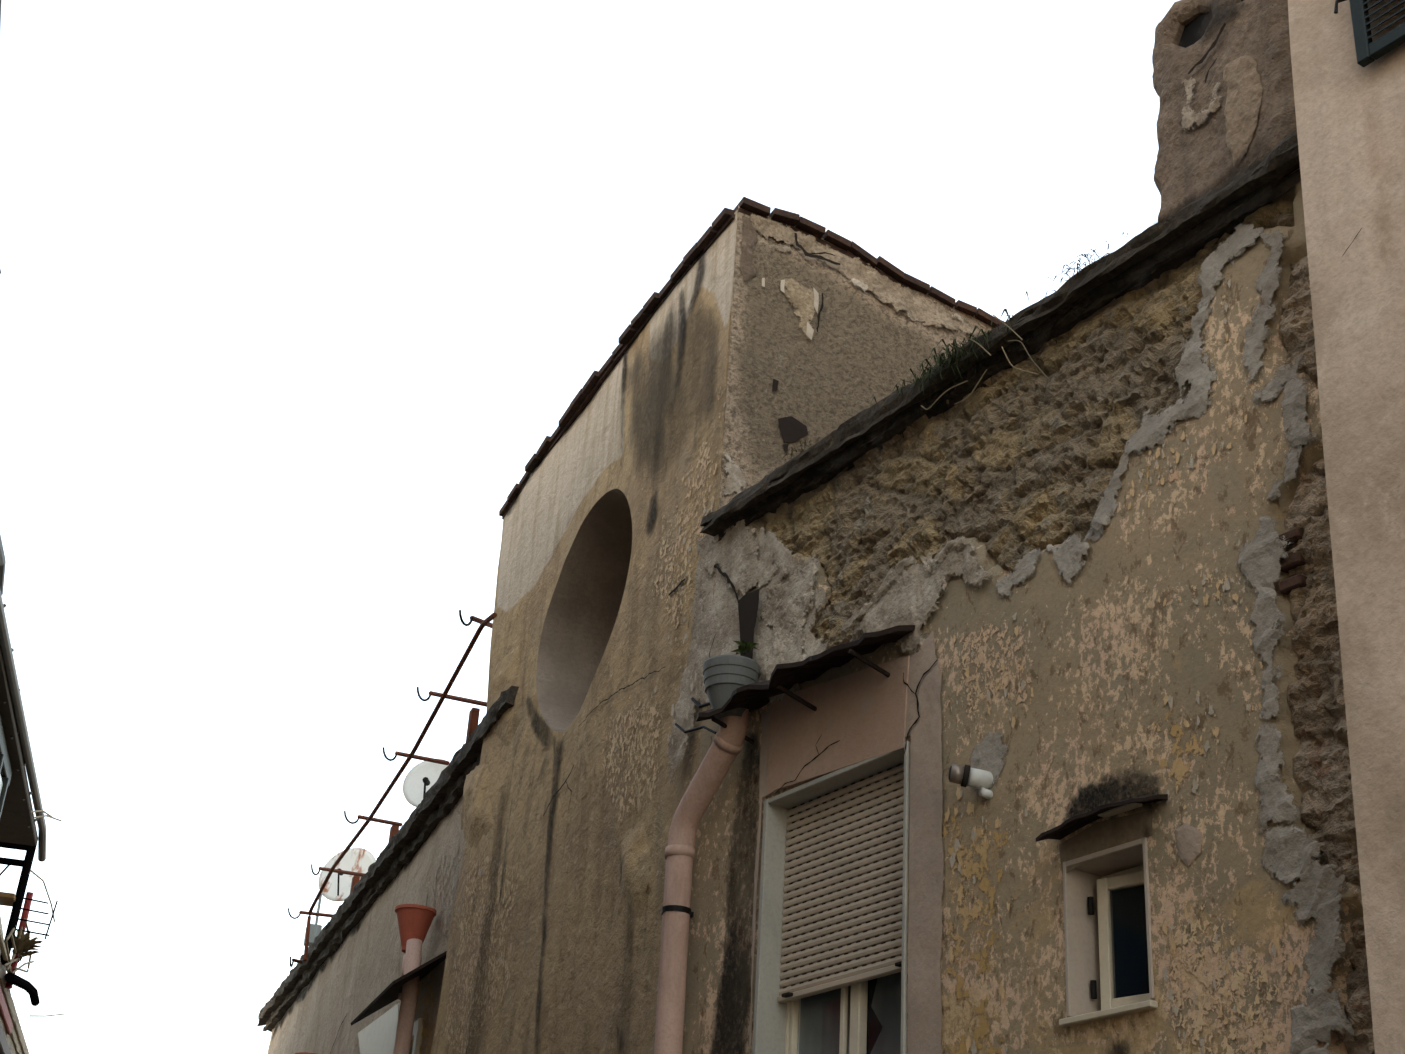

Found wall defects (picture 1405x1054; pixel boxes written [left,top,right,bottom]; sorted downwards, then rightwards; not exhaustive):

flaking render [740,216,824,341]
crack [794,233,840,265]
water stain [621,250,714,467]
water stain [647,492,656,533]
peeling [1128,403,1268,520]
flaking render [596,434,833,842]
peeling [1144,550,1254,626]
crack [903,660,937,754]
water stain [527,699,563,1047]